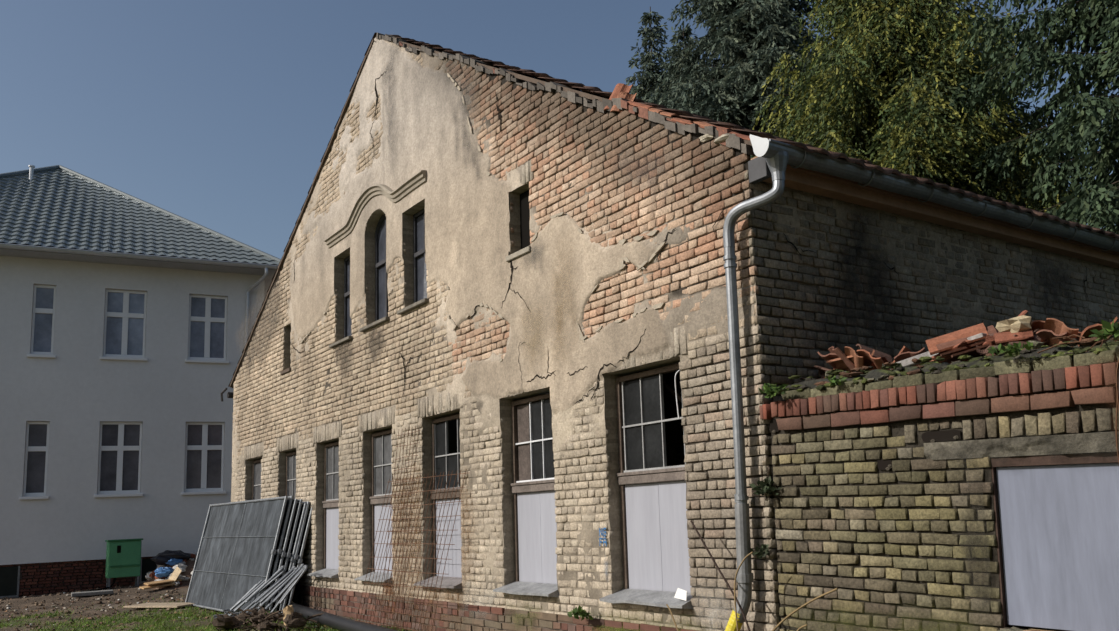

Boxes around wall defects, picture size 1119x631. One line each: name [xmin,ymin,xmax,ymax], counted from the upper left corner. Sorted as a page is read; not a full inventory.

crack [370,71,386,163]
flaking render [447,64,758,342]
crack [469,252,530,319]
crack [518,329,646,404]